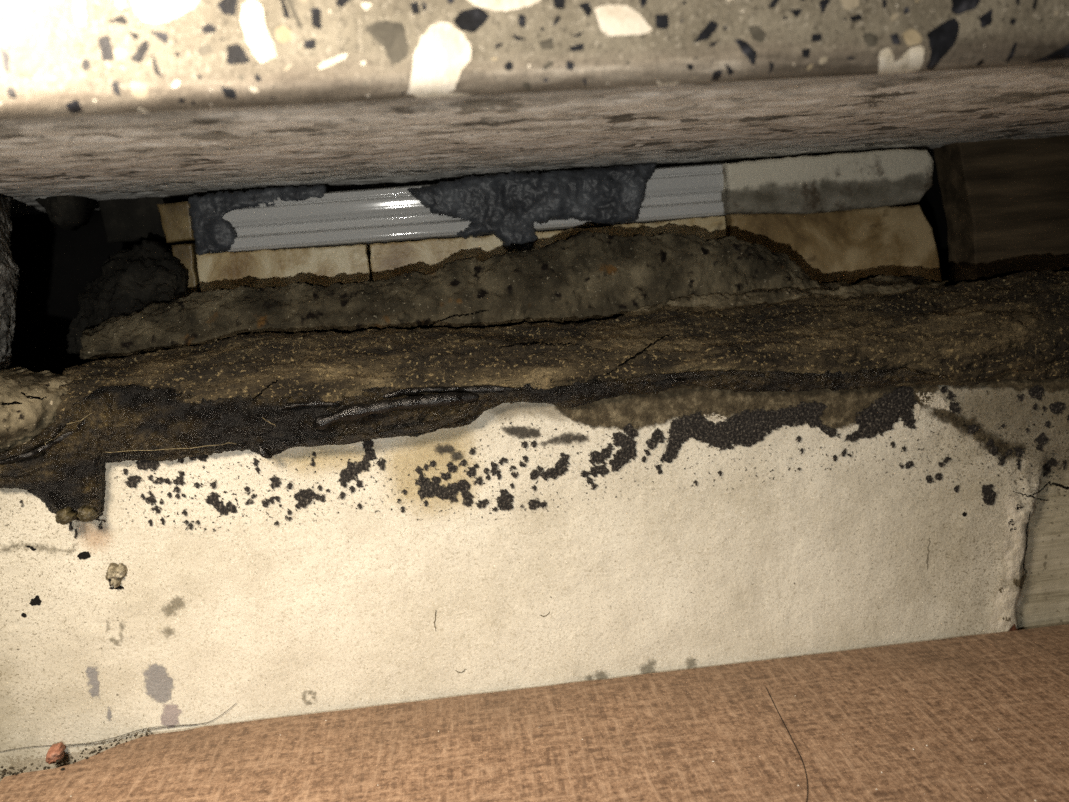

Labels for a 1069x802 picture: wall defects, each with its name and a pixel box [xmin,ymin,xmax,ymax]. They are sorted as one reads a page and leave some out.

leakage [115,379,1069,532]
crack [1013,481,1069,576]